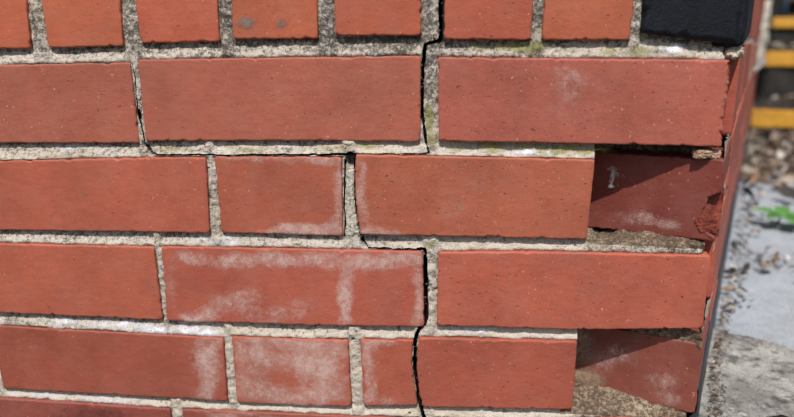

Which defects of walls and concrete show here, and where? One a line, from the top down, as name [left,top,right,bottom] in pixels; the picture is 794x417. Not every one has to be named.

crack [132,0,444,417]
spalling [695,187,725,237]
water stain [273,340,335,401]